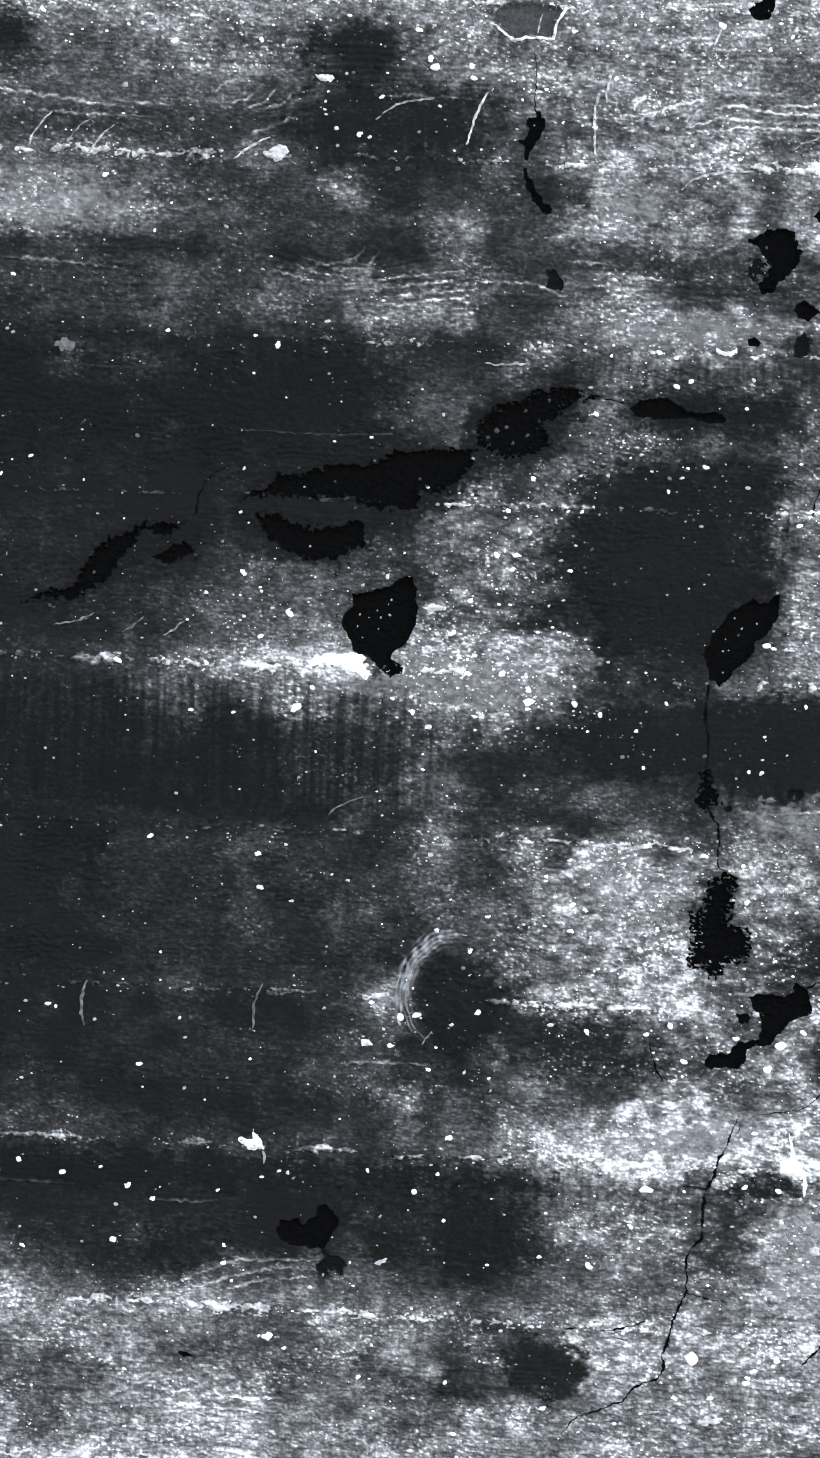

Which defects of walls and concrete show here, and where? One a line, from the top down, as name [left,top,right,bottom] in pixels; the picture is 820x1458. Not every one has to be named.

spalling [494,1,564,38]
spalling [746,228,803,294]
leakage [617,304,781,357]
leakage [0,336,585,576]
spalling [342,576,418,678]
leakage [283,368,820,841]
leakage [0,687,398,855]
spalling [686,872,752,981]
crack [648,1036,663,1080]
spalling [704,983,812,1069]
leakage [0,1129,562,1283]
crack [561,1095,820,1435]